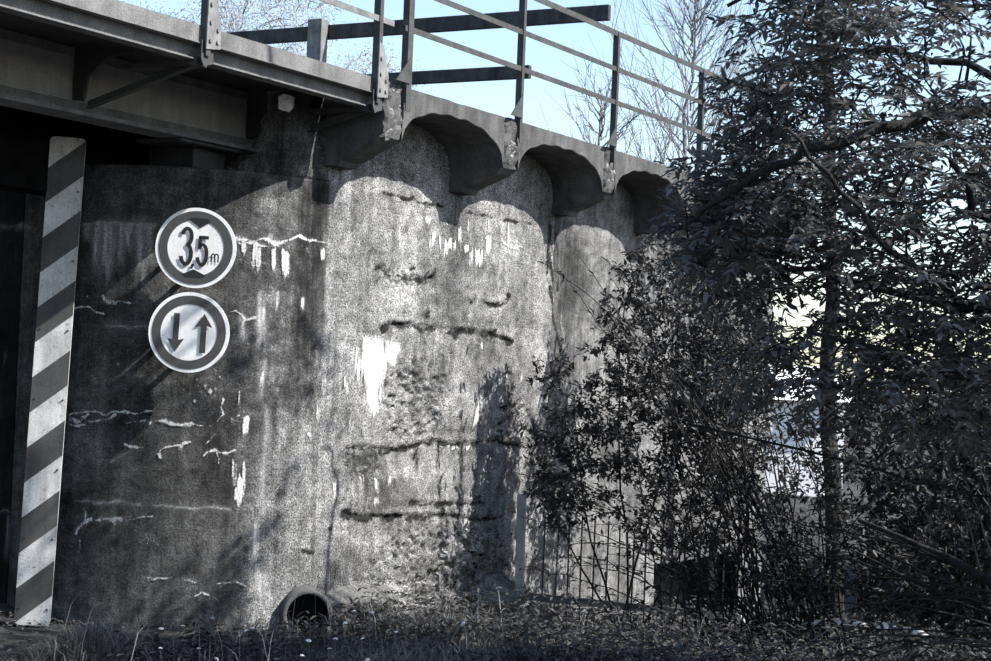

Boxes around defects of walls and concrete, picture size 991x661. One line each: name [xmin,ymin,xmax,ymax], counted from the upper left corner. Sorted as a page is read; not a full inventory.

peeling [355,327,446,450]
efflorescence [232,461,246,506]